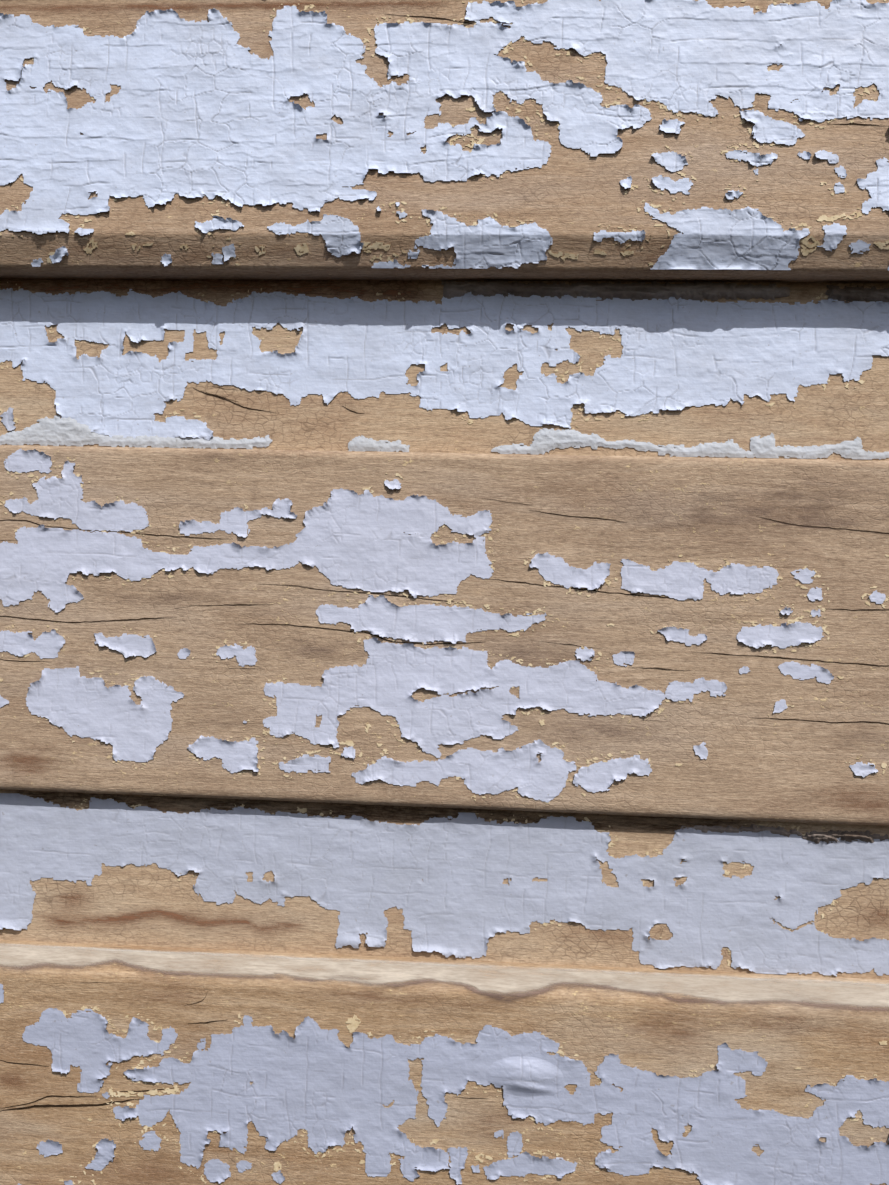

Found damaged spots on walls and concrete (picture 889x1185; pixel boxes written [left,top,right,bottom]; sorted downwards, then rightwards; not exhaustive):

peeling [0,0,889,805]
peeling [22,1006,889,1185]